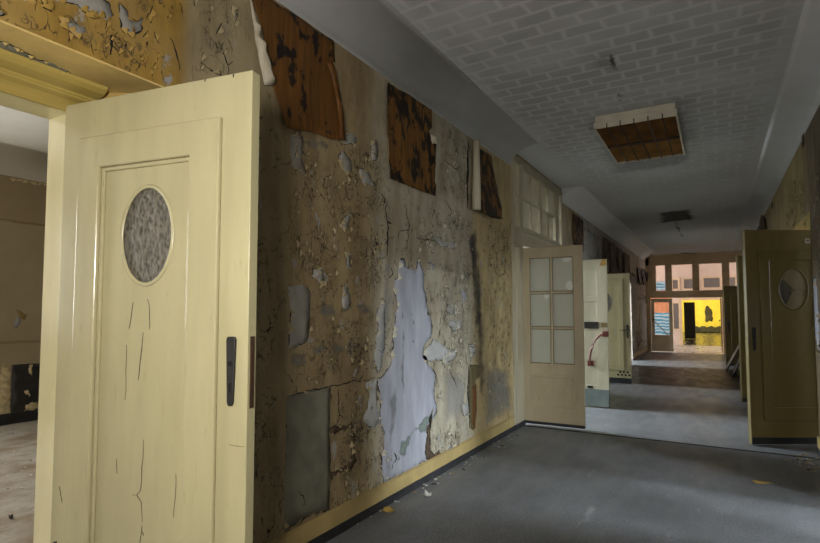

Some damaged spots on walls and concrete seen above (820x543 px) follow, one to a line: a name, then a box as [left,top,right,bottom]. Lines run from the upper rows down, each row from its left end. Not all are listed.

peeling [0,41,71,74]
peeling [25,0,165,79]
peeling [199,0,240,81]
flaking render [284,121,477,531]
flaking render [0,364,11,415]
peeling [24,390,38,411]